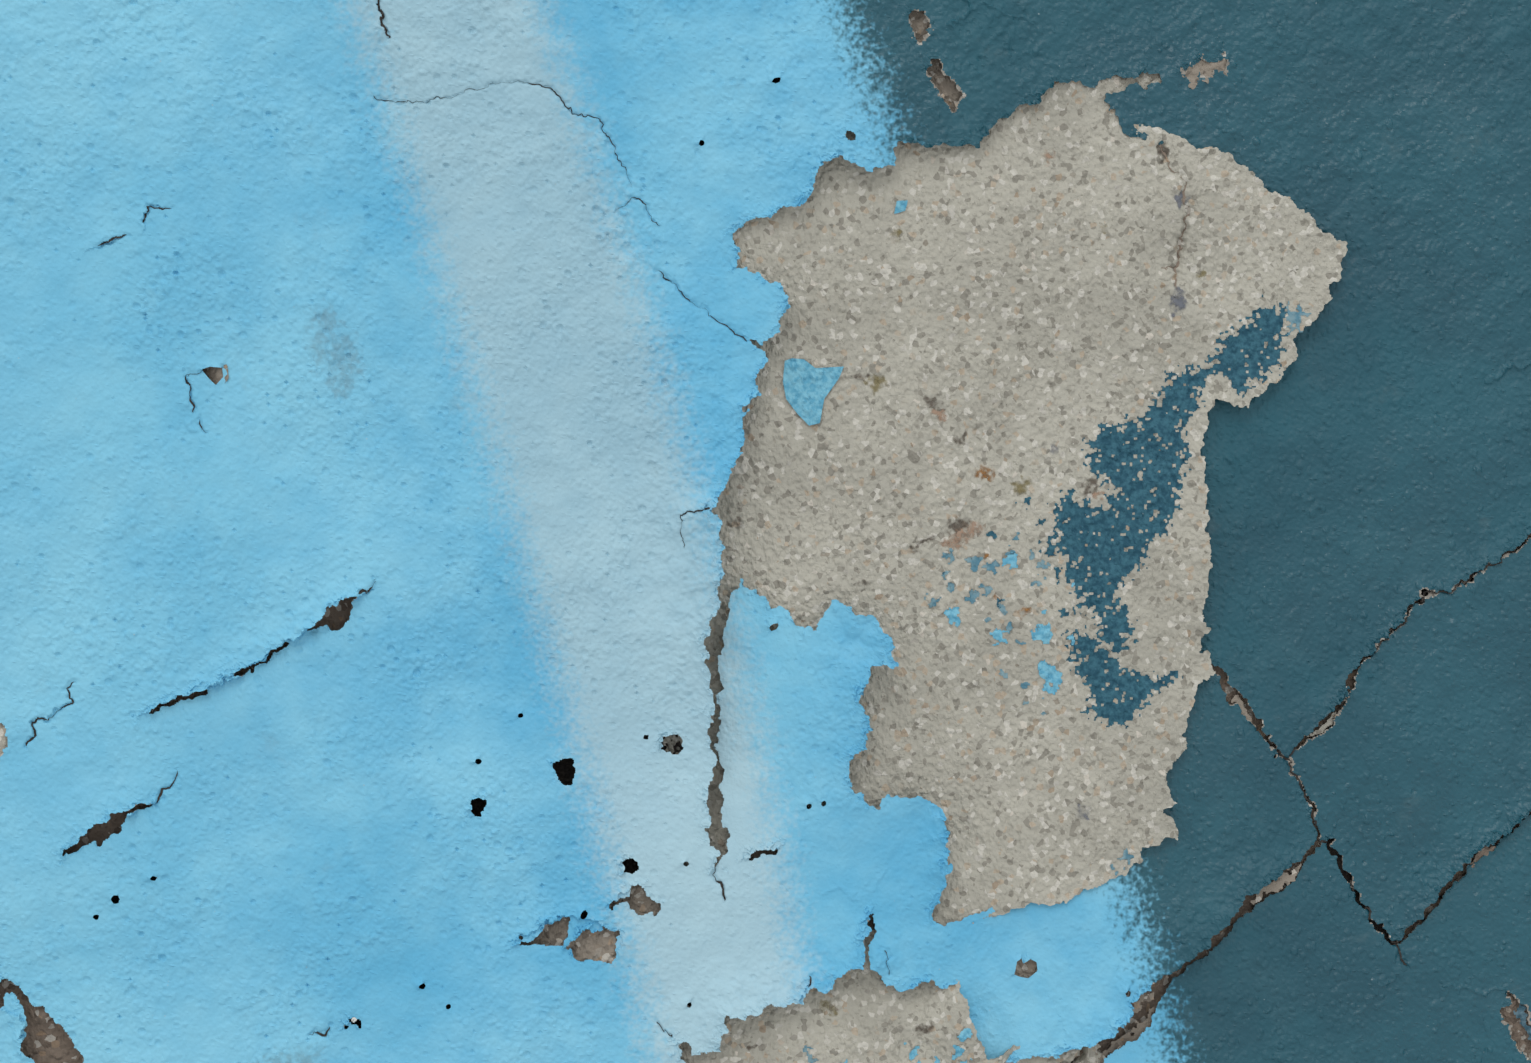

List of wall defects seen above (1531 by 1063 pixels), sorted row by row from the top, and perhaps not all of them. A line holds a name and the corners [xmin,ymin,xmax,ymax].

peeling [909,10,930,43]
peeling [927,58,963,112]
peeling [644,72,1348,1063]
peeling [145,584,374,714]
peeling [0,723,8,757]
spalling [62,798,153,857]
crack [1041,533,1531,1063]
peeling [609,884,661,916]
peeling [519,917,620,964]
spalling [0,979,84,1063]
peeling [1500,992,1531,1059]